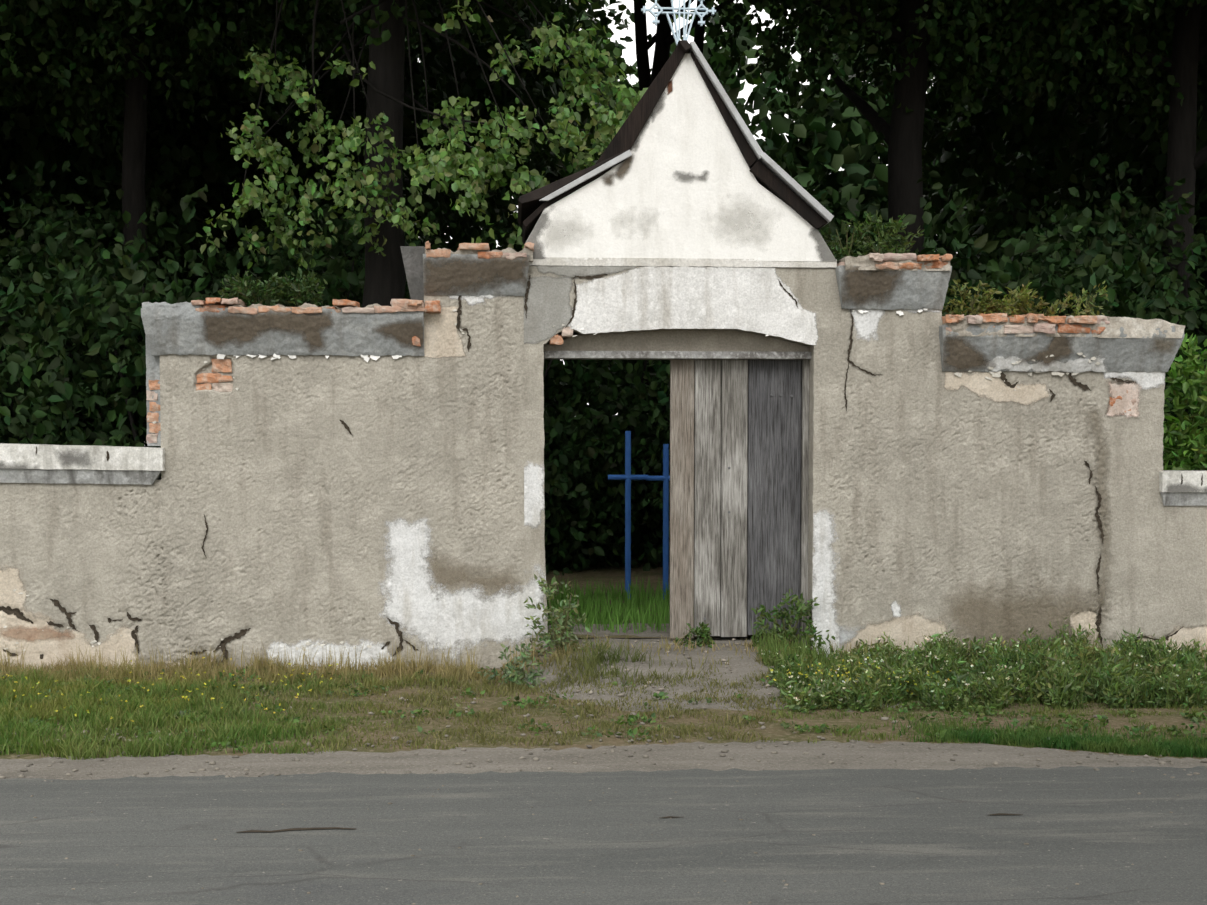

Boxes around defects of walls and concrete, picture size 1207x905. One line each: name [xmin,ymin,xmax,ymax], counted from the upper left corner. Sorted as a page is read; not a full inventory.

crack [453,295,471,352]
flaking render [196,353,296,392]
crack [844,309,881,411]
flaking render [944,352,1165,419]
flaking render [0,567,140,672]